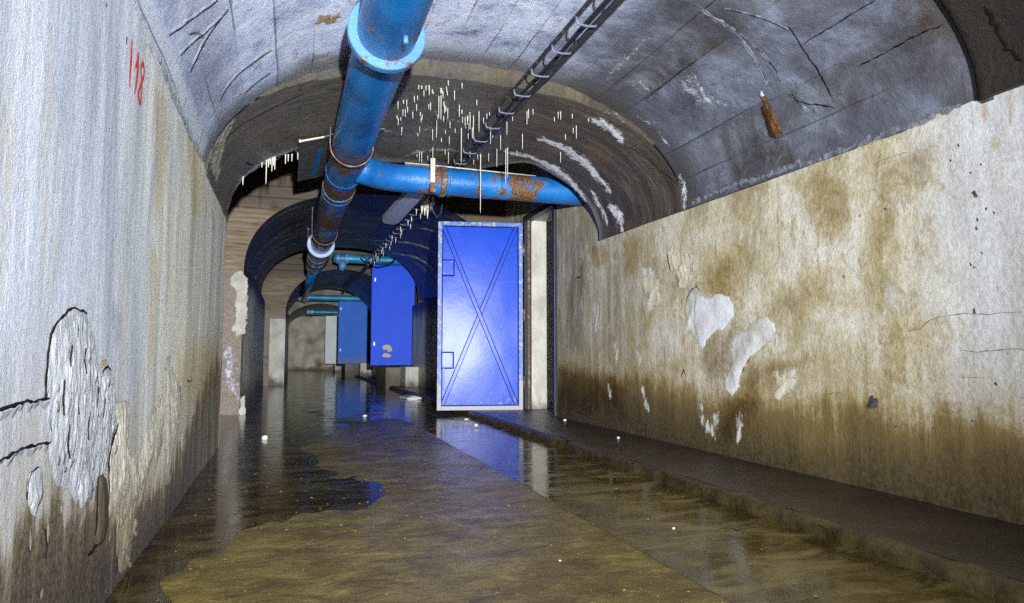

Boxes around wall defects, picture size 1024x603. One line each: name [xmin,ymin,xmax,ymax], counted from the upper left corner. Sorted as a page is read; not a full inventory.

crack [167,0,229,72]
crack [218,49,272,100]
crack [700,1,874,113]
crack [858,24,943,67]
corrosion [759,91,783,138]
efflorescence [503,136,624,232]
flaking render [230,271,249,336]
spalling [641,245,776,395]
crack [0,306,88,466]
flaking render [26,304,186,574]
flaking render [222,346,246,415]
efflorescence [697,394,719,441]